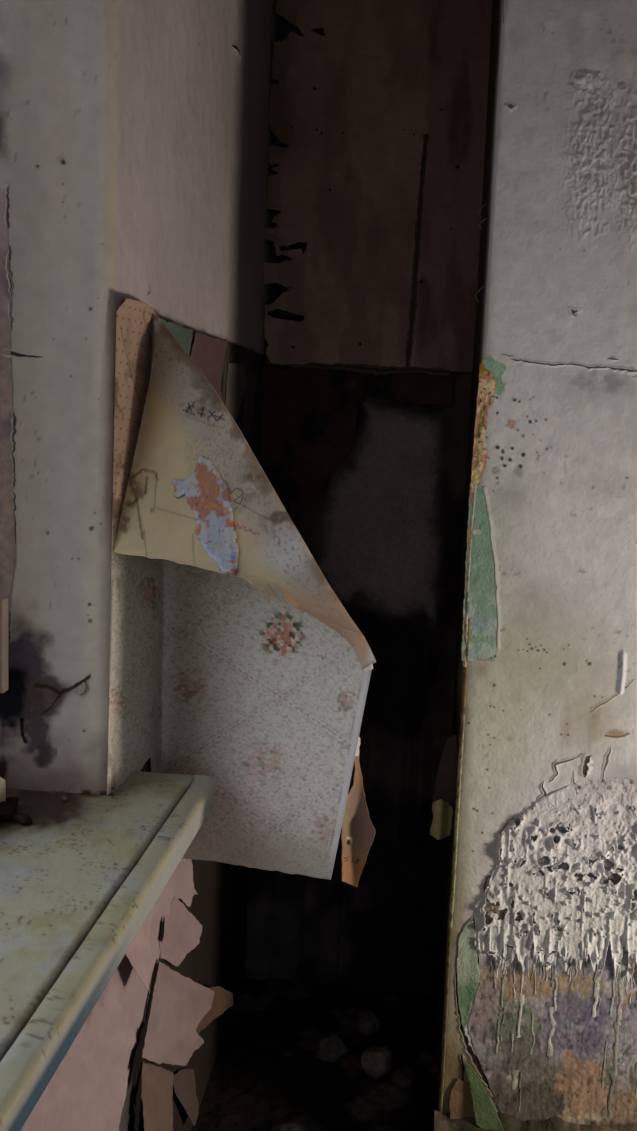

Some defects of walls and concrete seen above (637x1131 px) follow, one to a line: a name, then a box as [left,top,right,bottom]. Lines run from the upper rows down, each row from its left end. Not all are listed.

crack [501,353,637,378]
peeling [107,298,438,880]
damp [0,631,91,766]
crack [589,678,636,714]
peeling [468,777,637,1131]